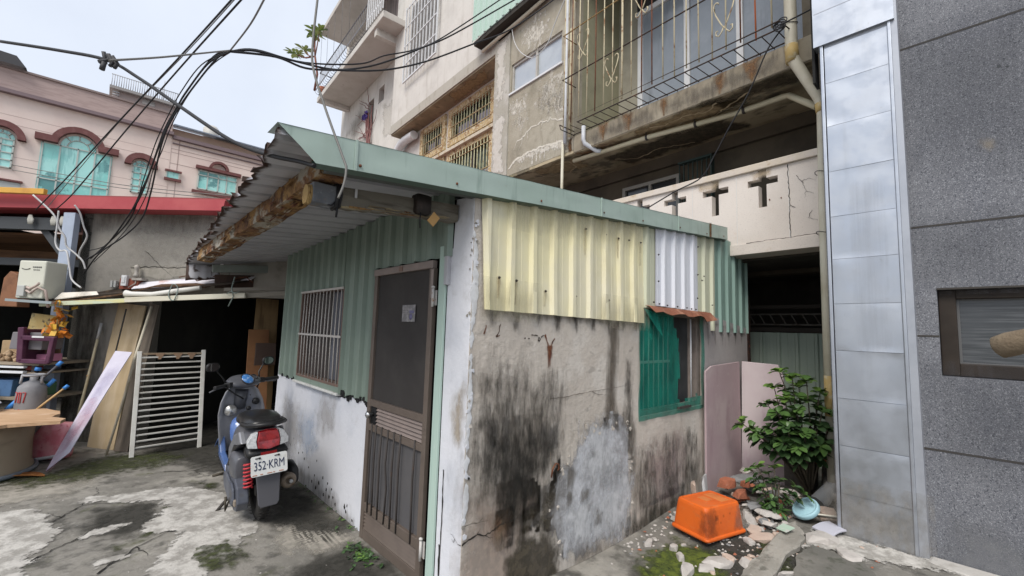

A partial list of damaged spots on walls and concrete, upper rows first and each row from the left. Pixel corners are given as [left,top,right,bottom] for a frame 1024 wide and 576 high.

crack [508,108,571,170]
crack [746,164,817,244]
corrosion [646,305,717,322]
damp [606,321,637,424]
crack [438,470,521,576]
damp [484,409,559,576]
spalling [549,411,676,576]
peeling [689,512,792,560]